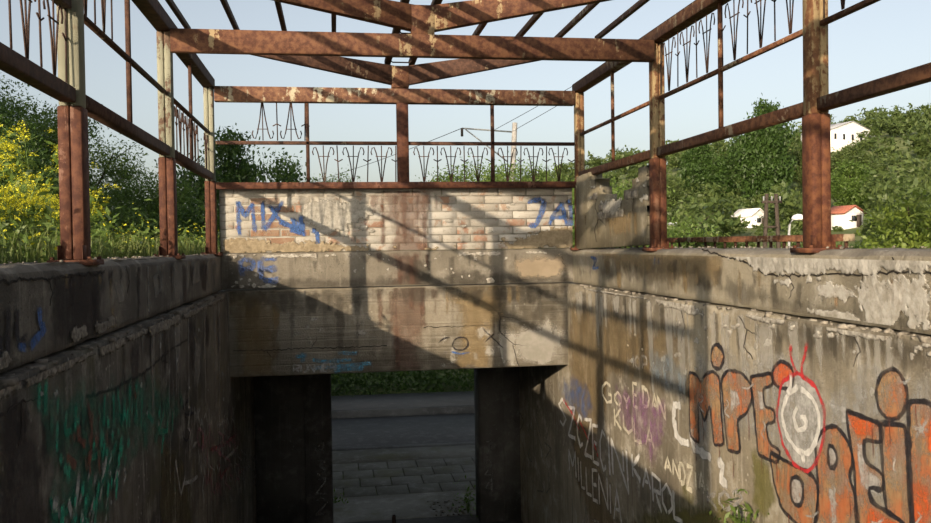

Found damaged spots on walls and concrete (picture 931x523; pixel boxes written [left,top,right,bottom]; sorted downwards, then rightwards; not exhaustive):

peeling [590,185,622,215]
peeling [223,198,397,271]
spalling [0,297,224,400]
water stain [451,286,499,368]
crack [424,305,528,366]
spalling [581,287,703,326]
spalling [694,314,795,365]
peeling [725,256,931,349]
spalling [910,342,931,360]